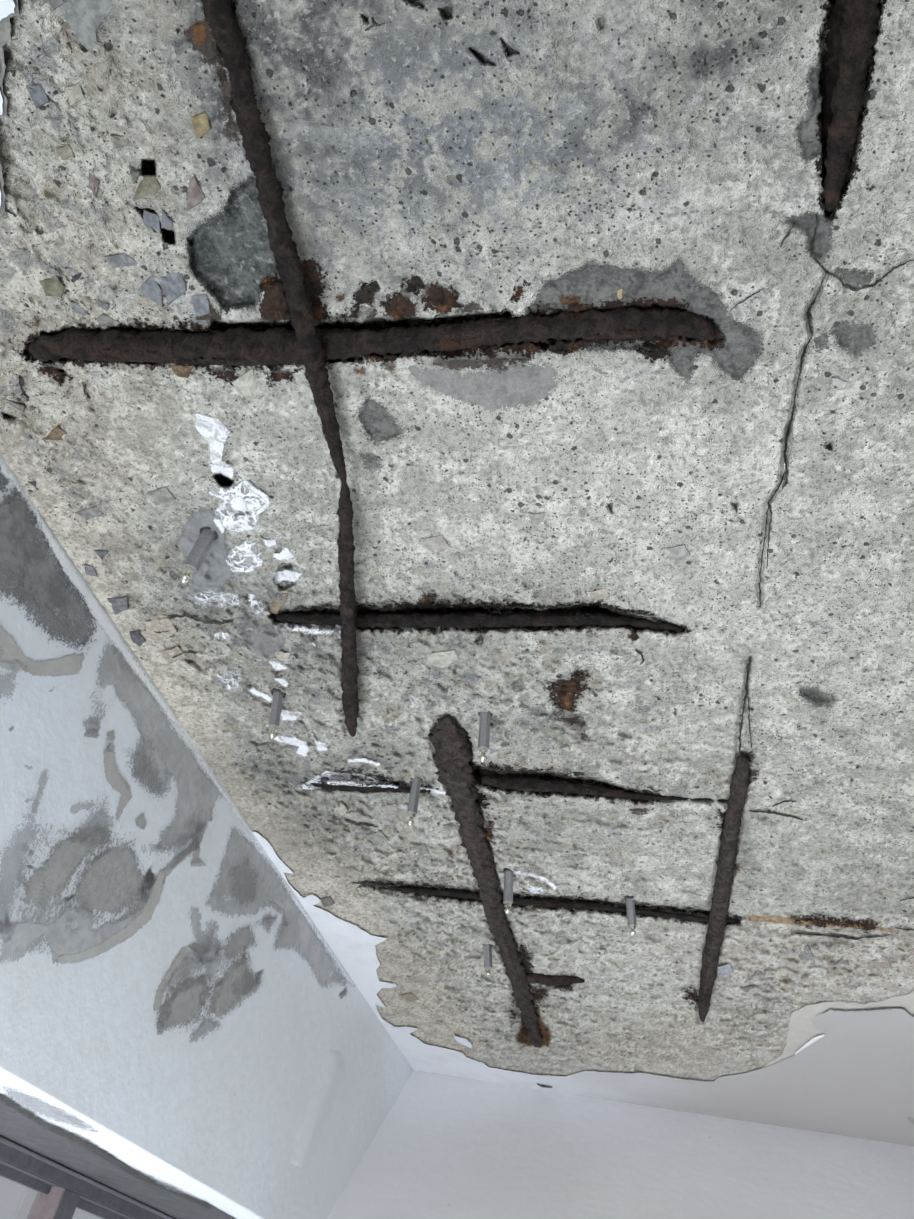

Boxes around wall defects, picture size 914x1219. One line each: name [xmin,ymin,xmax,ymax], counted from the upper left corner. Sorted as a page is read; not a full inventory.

rust [814,0,887,223]
peeling [0,487,98,704]
water stain [194,414,302,584]
water stain [281,623,356,646]
rust [17,0,726,743]
crack [759,214,914,605]
peeling [0,642,220,966]
peeling [153,906,264,1042]
peeling [205,826,355,988]
water stain [274,735,327,757]
water stain [293,758,398,792]
rust [301,716,893,1048]